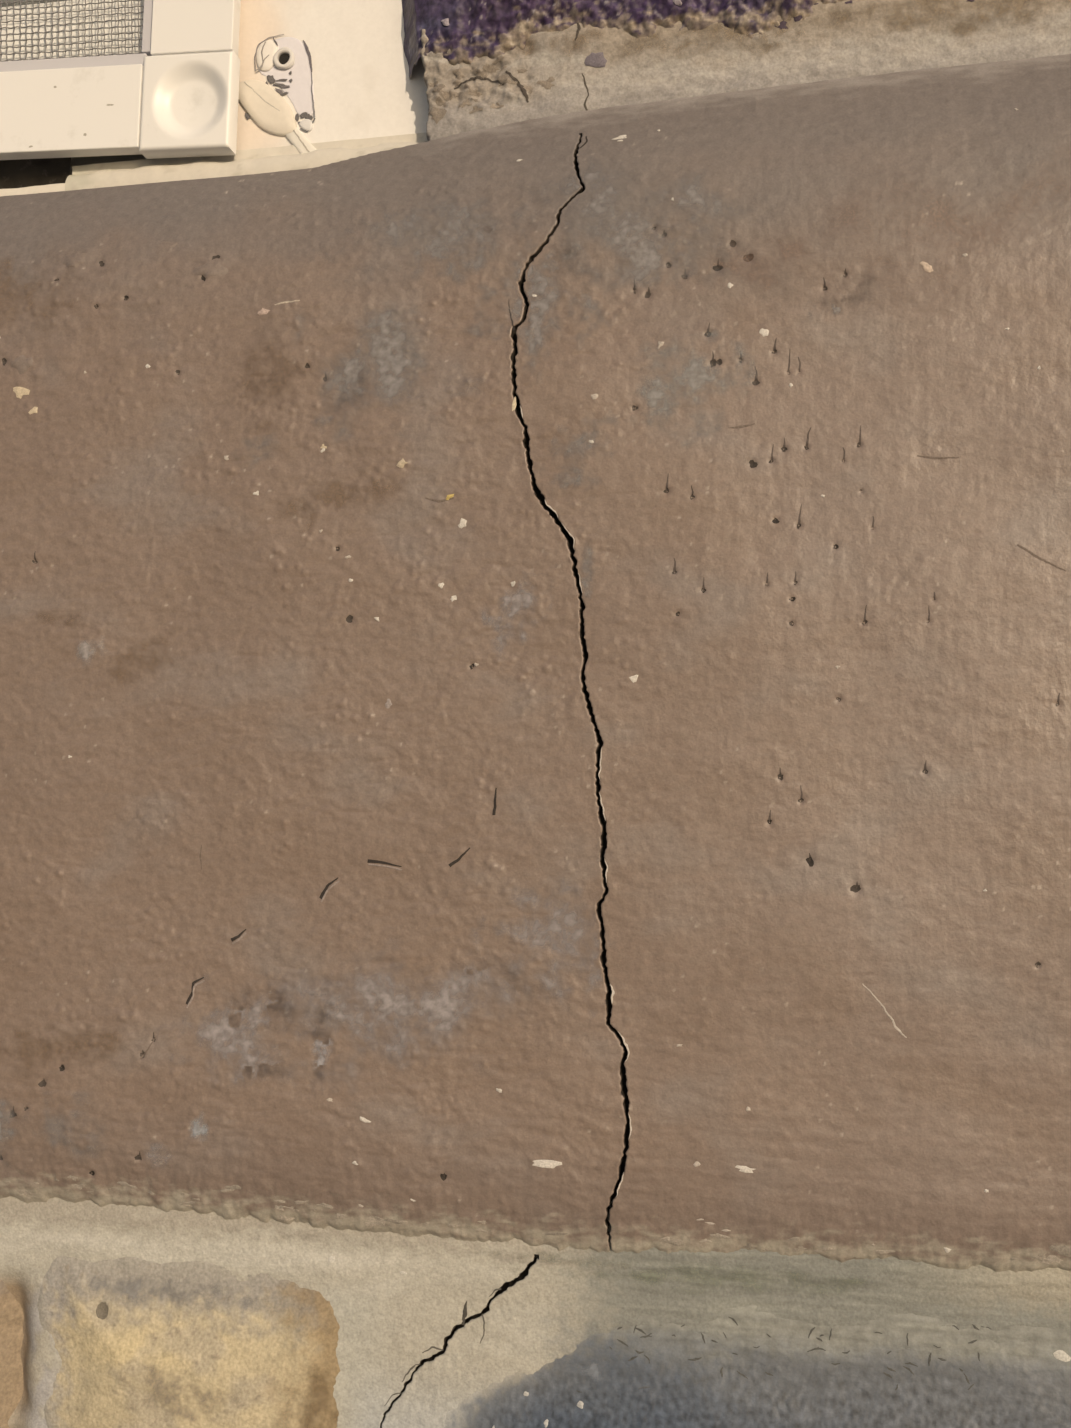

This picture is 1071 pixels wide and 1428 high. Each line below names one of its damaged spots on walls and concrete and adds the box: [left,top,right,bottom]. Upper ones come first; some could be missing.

crack [508,23,632,1247]
crack [380,1255,539,1428]